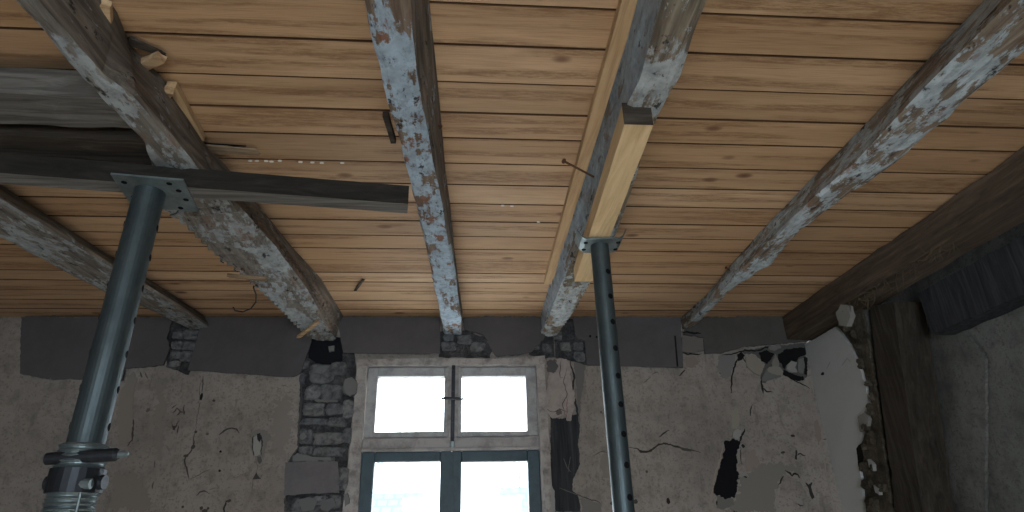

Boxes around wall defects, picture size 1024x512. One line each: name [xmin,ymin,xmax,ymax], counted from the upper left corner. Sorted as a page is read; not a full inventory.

flaking render [166,321,200,375]
flaking render [529,318,586,421]
crack [681,331,810,442]
spalling [737,343,808,383]
crack [595,430,699,455]
spalling [713,429,747,512]